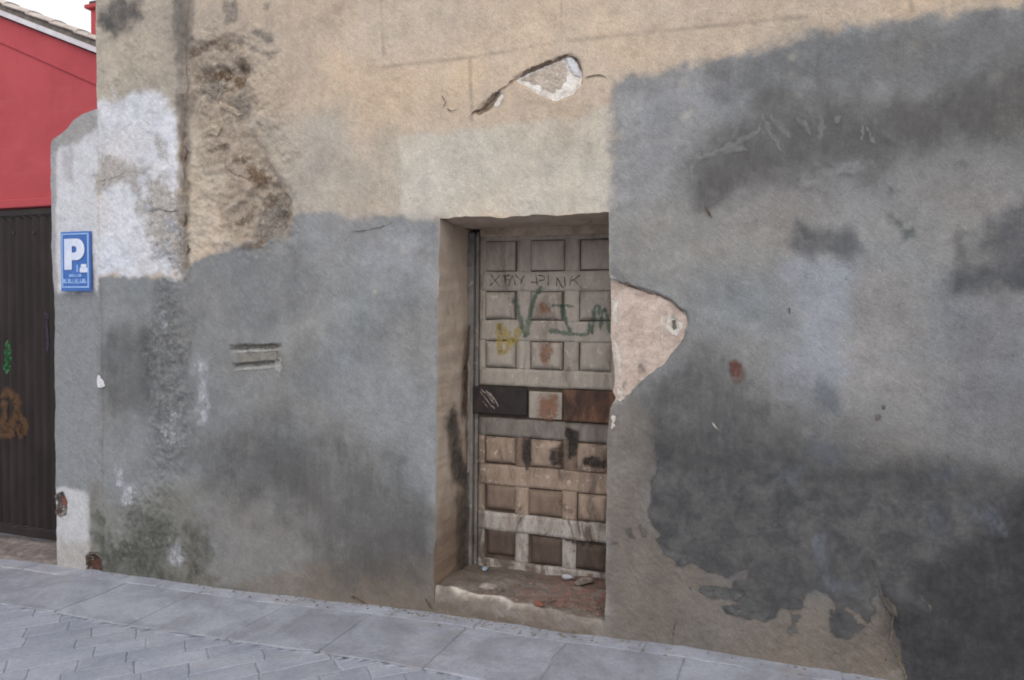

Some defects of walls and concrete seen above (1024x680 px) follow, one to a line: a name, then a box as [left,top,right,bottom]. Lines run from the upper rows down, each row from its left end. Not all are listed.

flaking render [470,54,607,116]
flaking render [188,37,292,249]
flaking render [610,262,688,401]
leakage [194,362,209,424]
corrosion [730,360,744,382]
leakage [115,469,133,505]
leakage [446,408,469,570]
leakage [169,543,184,565]
leakage [648,386,1024,680]